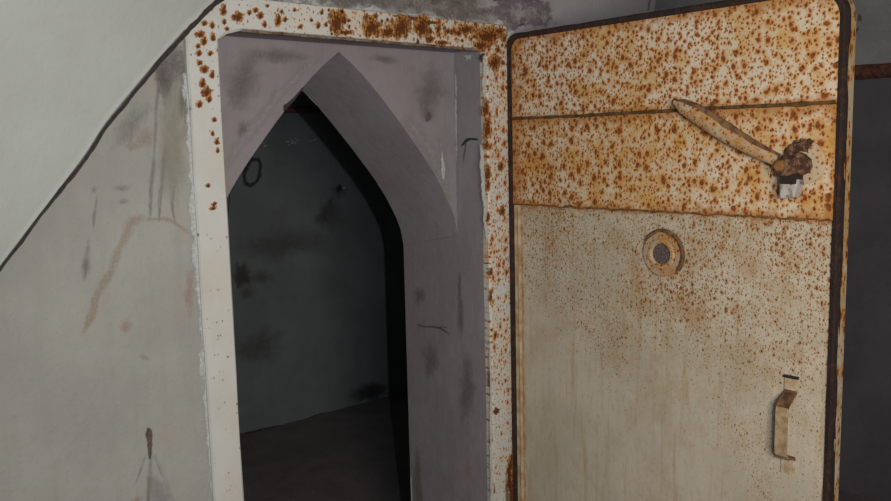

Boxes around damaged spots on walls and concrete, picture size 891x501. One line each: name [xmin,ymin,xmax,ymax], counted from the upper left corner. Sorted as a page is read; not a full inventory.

corrosion [194,0,862,501]